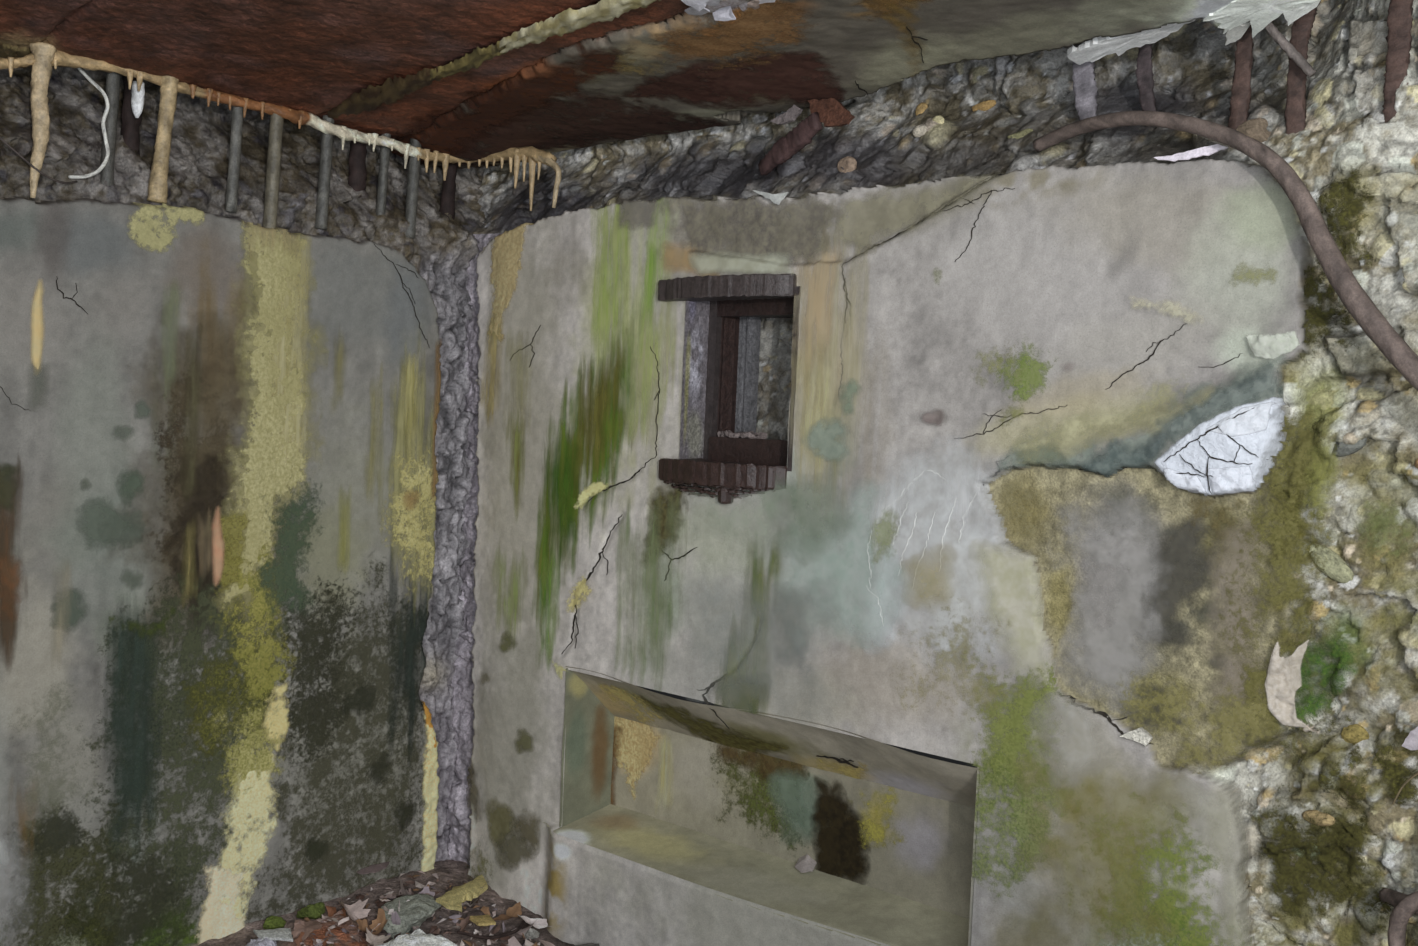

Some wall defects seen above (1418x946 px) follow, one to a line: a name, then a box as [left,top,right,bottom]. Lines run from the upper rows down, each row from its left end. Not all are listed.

rust [120,75,142,155]
spalling [0,66,270,226]
damp [129,202,204,252]
rust [392,2,845,220]
damp [638,198,669,395]
spalling [276,47,1260,264]
crack [831,174,1015,422]
rust [0,466,20,661]
damp [0,220,441,946]
crack [562,346,660,654]
spalling [989,0,1418,946]
crack [1164,408,1269,494]